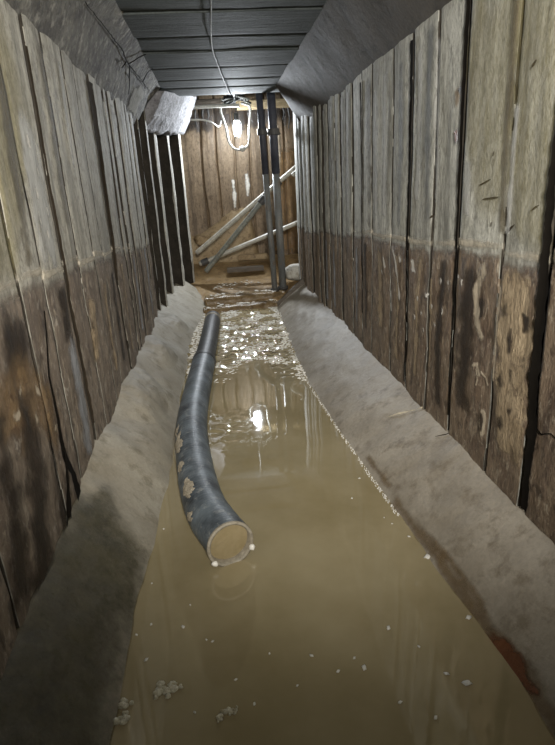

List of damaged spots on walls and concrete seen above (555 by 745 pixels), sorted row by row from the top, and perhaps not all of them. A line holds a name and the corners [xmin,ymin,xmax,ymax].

crack [25,45,95,423]
crack [44,311,81,527]
leakage [0,244,158,745]
leakage [298,75,555,544]
leakage [415,31,440,199]
corrosion [489,634,539,696]